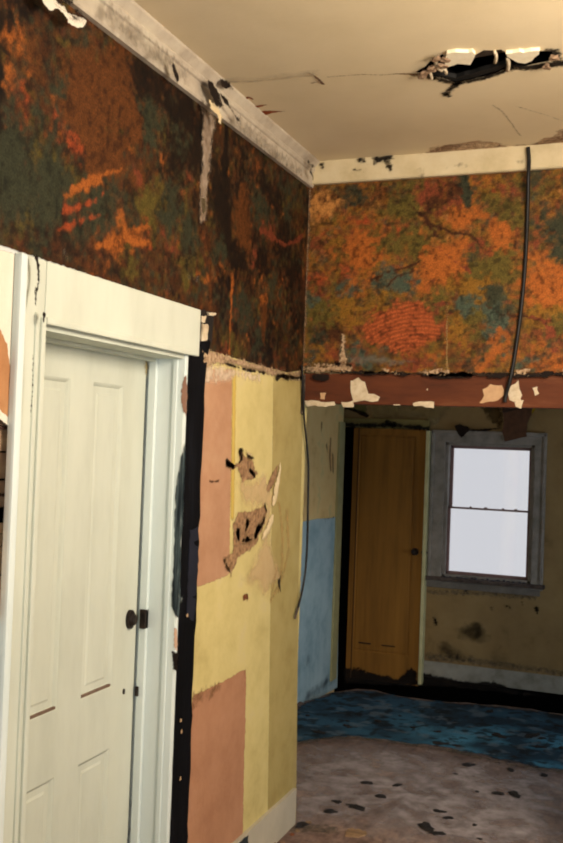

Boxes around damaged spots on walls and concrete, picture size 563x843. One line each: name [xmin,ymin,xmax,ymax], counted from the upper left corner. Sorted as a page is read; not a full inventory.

flaking render [43,0,86,28]
peeling [445,48,475,67]
peeling [506,47,540,64]
peeling [354,155,393,171]
flaking render [0,330,10,426]
flaking render [197,309,352,586]